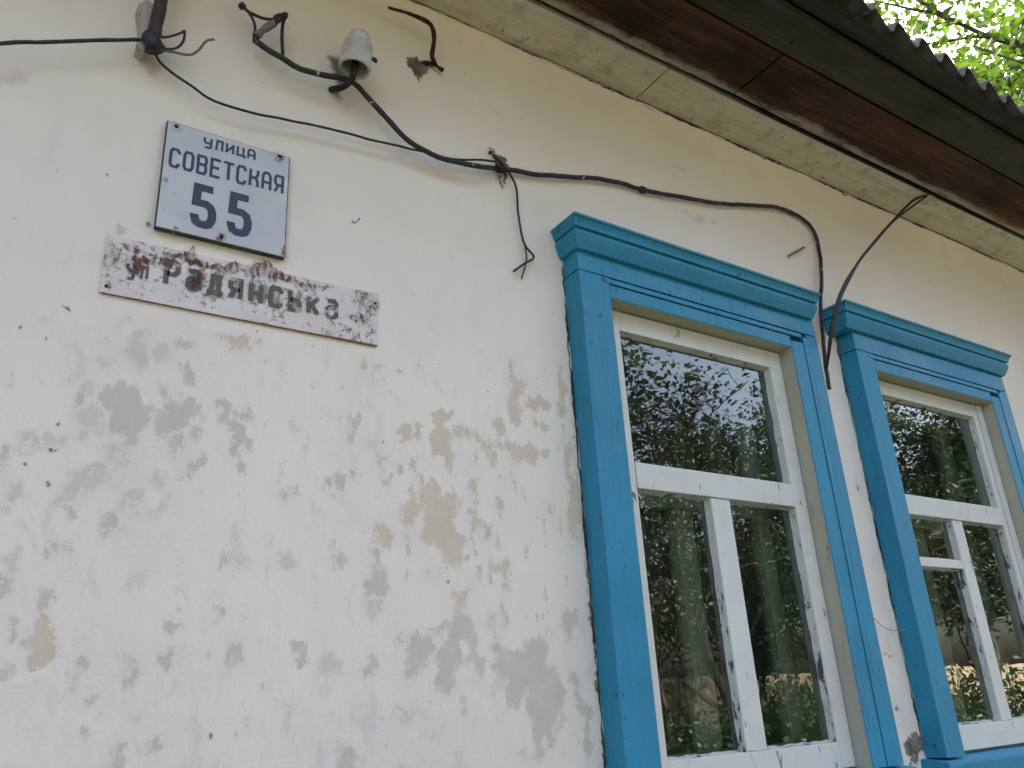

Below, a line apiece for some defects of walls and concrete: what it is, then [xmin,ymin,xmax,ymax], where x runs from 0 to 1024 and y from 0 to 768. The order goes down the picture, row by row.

peeling [0,584,61,684]
peeling [359,359,607,768]